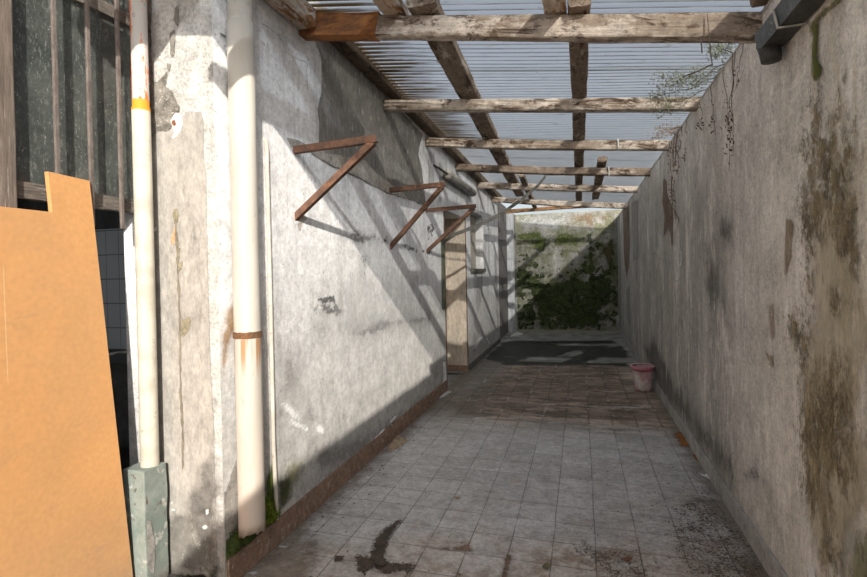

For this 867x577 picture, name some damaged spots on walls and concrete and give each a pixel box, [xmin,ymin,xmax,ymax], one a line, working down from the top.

flaking render [147,0,180,138]
flaking render [287,41,426,204]
rust [223,307,234,362]
leakage [314,295,341,316]